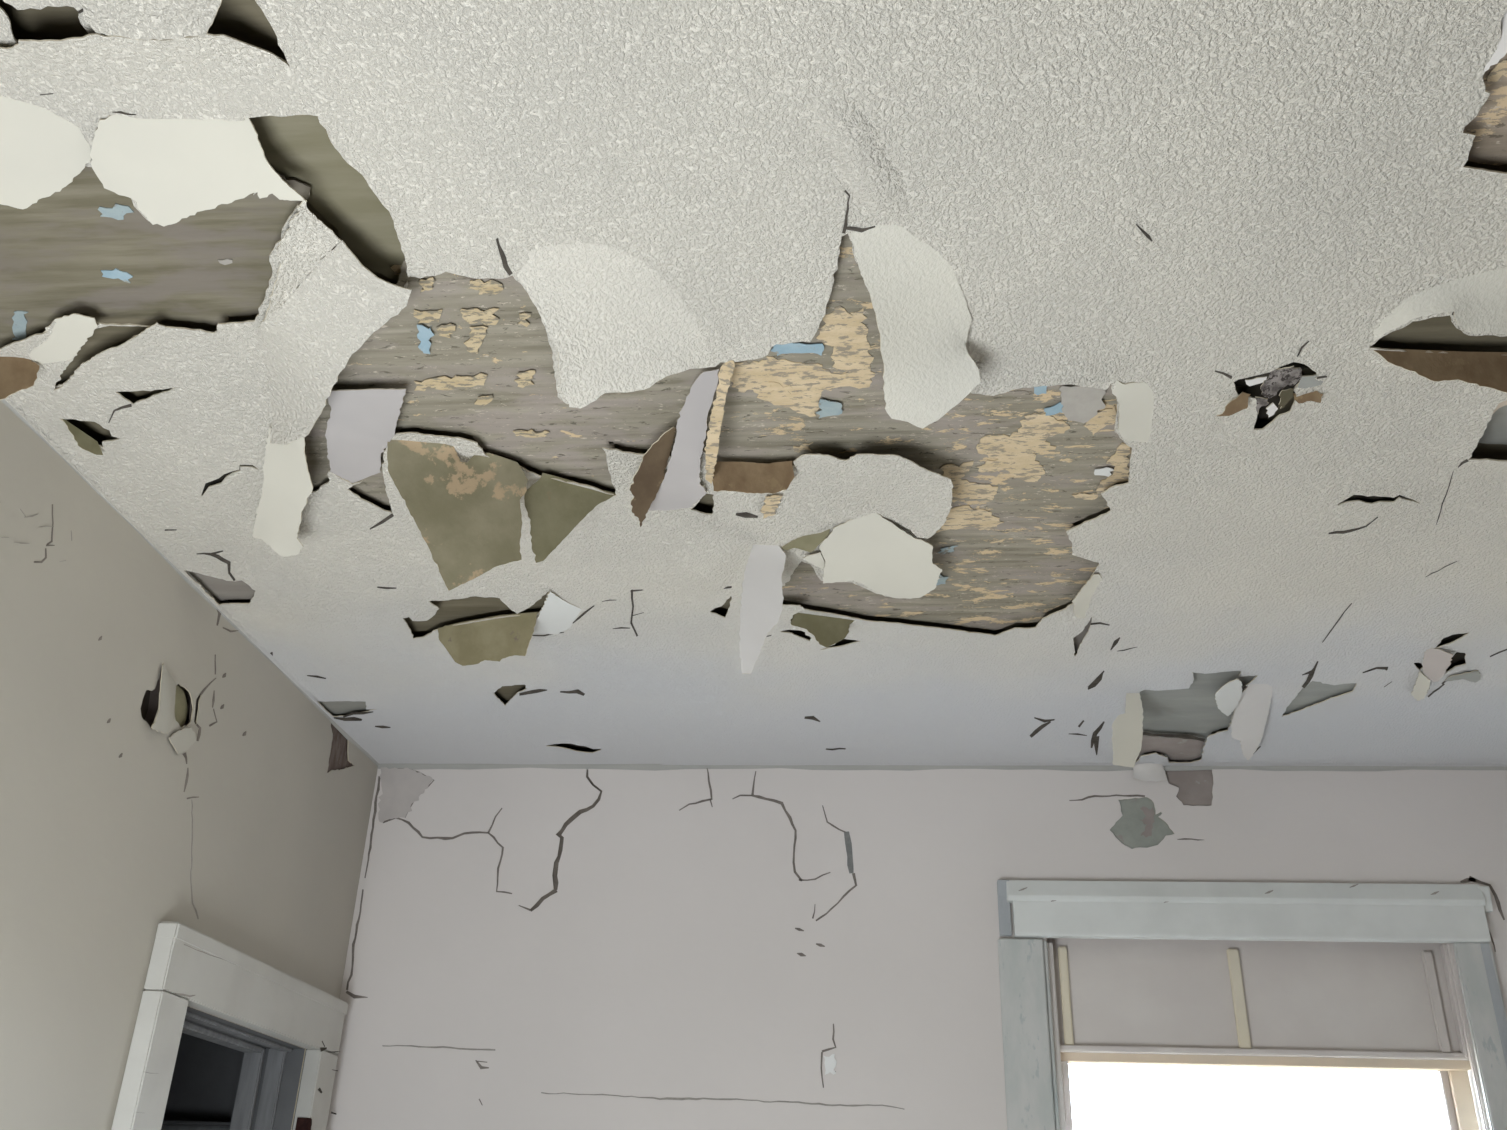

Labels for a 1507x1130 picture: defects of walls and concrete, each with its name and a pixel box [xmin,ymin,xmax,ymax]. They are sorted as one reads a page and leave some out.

peeling [1463,11,1507,166]
peeling [0,96,311,400]
peeling [62,419,103,455]
peeling [305,190,1154,674]
peeling [1216,376,1267,416]
peeling [1373,268,1507,445]
peeling [188,550,255,601]
crack [183,610,239,965]
peeling [318,701,390,773]
crack [346,743,602,999]
crack [679,768,857,956]
peeling [1069,671,1272,849]